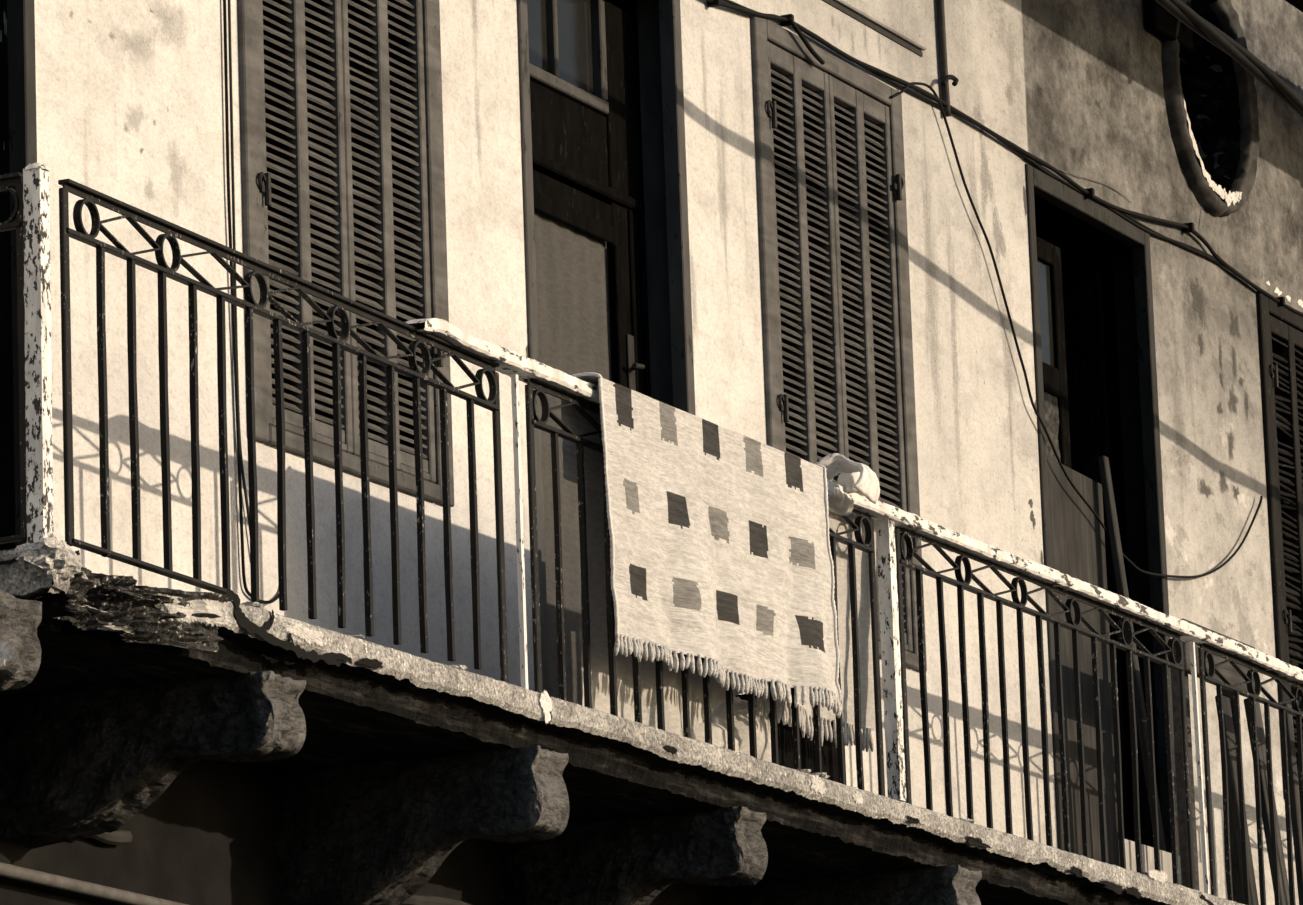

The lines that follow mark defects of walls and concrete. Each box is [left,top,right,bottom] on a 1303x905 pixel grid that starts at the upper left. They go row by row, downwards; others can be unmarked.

peeling [1184,100,1242,207]
spalling [56,550,231,652]